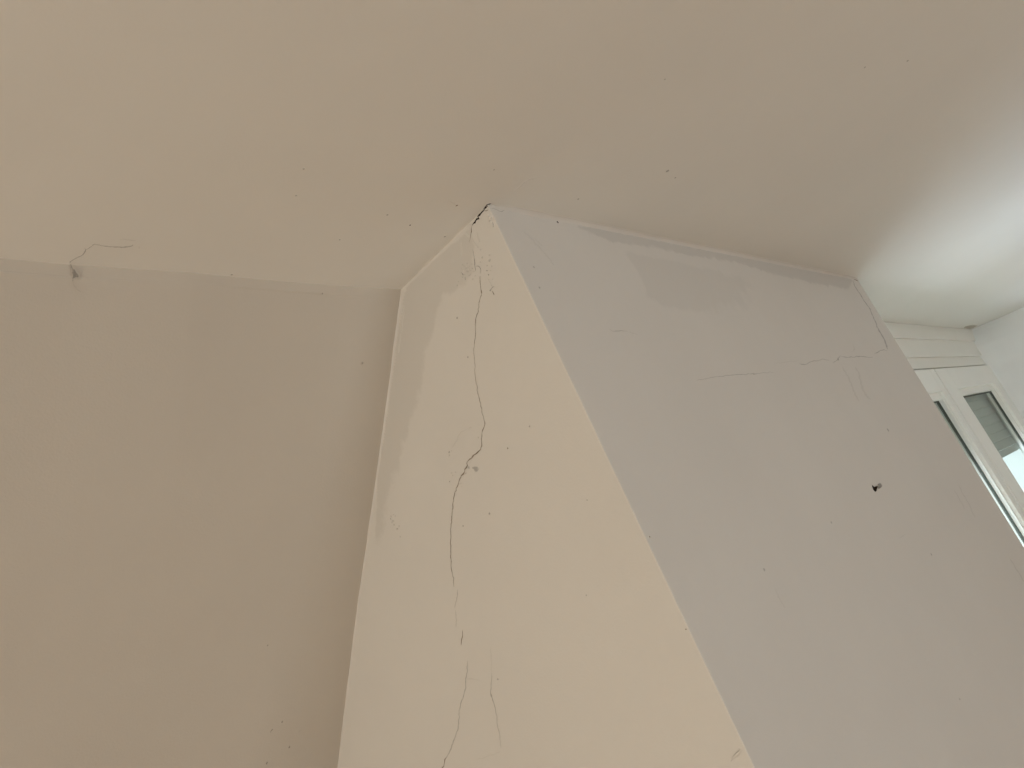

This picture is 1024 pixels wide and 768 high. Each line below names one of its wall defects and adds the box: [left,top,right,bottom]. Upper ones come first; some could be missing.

crack [442,203,501,768]